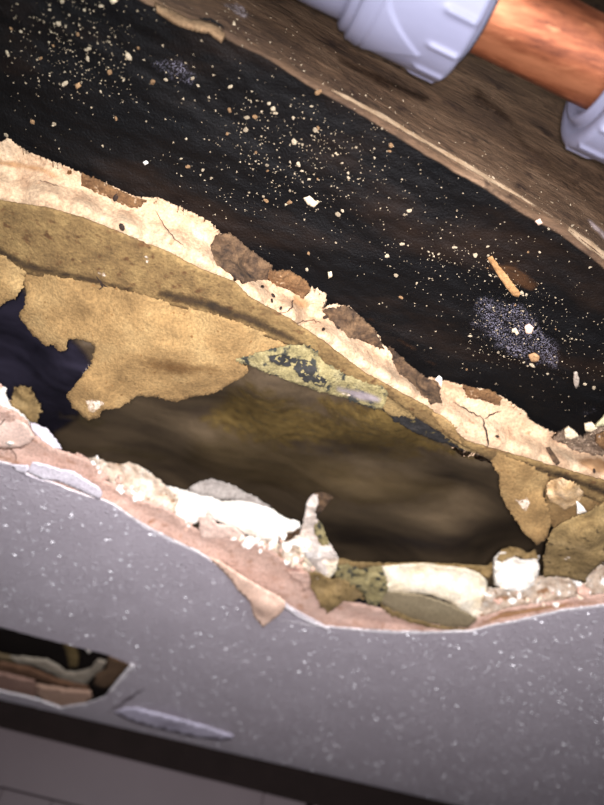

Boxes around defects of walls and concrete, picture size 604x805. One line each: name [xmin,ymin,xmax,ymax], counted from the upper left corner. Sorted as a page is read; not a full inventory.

spalling [0,649,135,707]
damp [0,0,604,436]
spalling [0,138,604,515]
spalling [0,390,604,631]